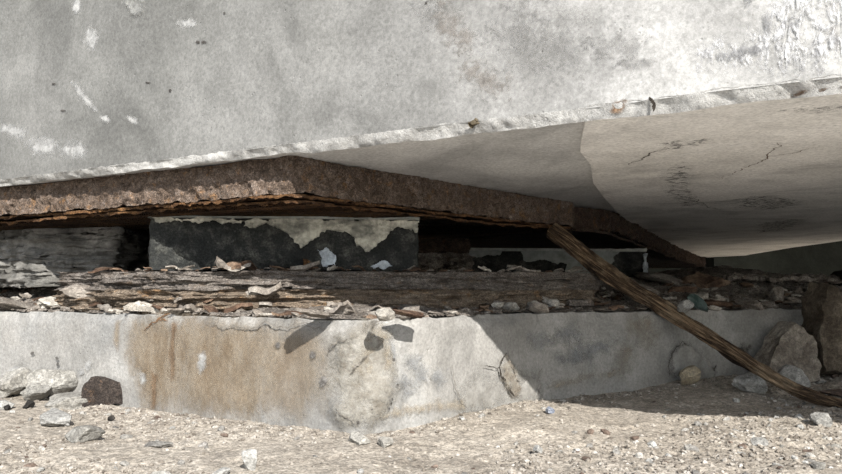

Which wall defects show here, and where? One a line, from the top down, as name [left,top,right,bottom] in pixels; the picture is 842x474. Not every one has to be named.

corrosion [0,194,731,288]
crack [487,353,542,397]